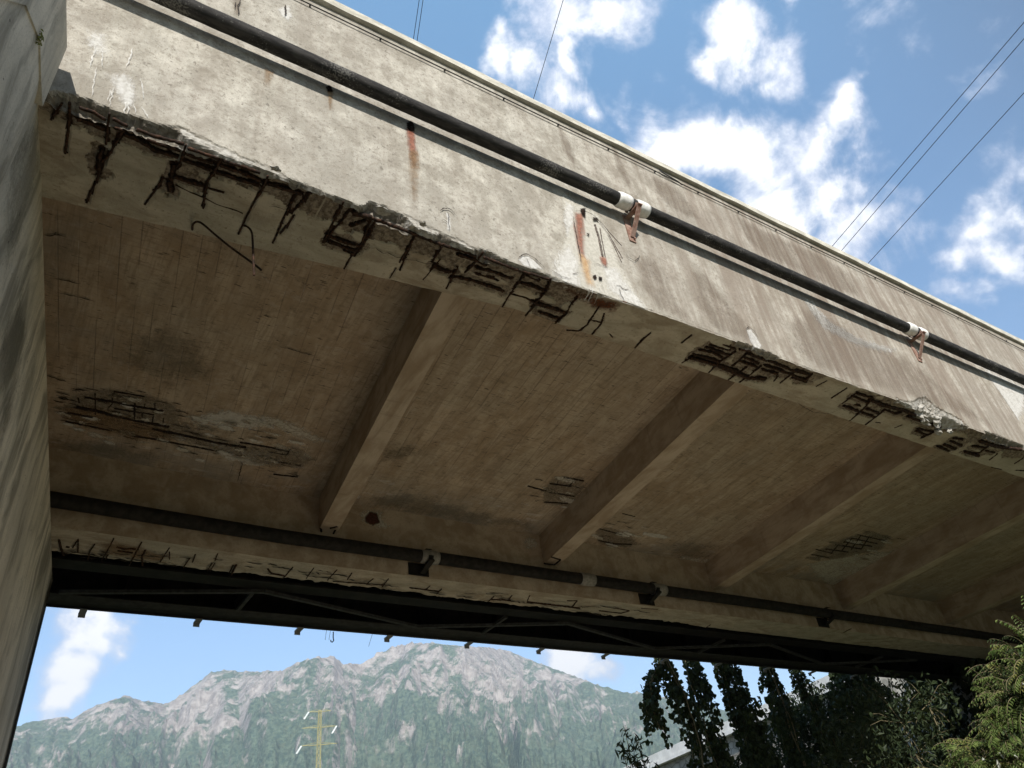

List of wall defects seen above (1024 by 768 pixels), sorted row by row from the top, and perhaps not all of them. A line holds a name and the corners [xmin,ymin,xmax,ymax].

corrosion [407,121,417,173]
spalling [38,92,617,338]
corrosion [576,214,592,284]
spalling [585,211,623,262]
spalling [681,334,827,387]
spalling [54,387,322,481]
spalling [831,387,1024,471]
spalling [527,476,586,508]
spalling [58,538,196,568]
spalling [807,531,907,585]
spalling [229,562,658,616]